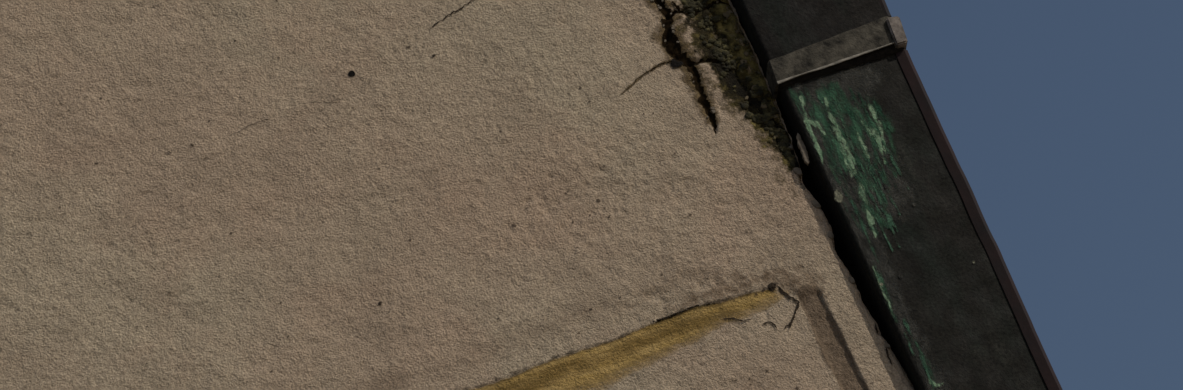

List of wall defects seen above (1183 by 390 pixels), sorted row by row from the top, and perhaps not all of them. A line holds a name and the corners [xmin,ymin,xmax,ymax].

crack [429,0,472,56]
crack [622,0,730,133]
water stain [791,64,949,390]
crack [724,286,800,329]